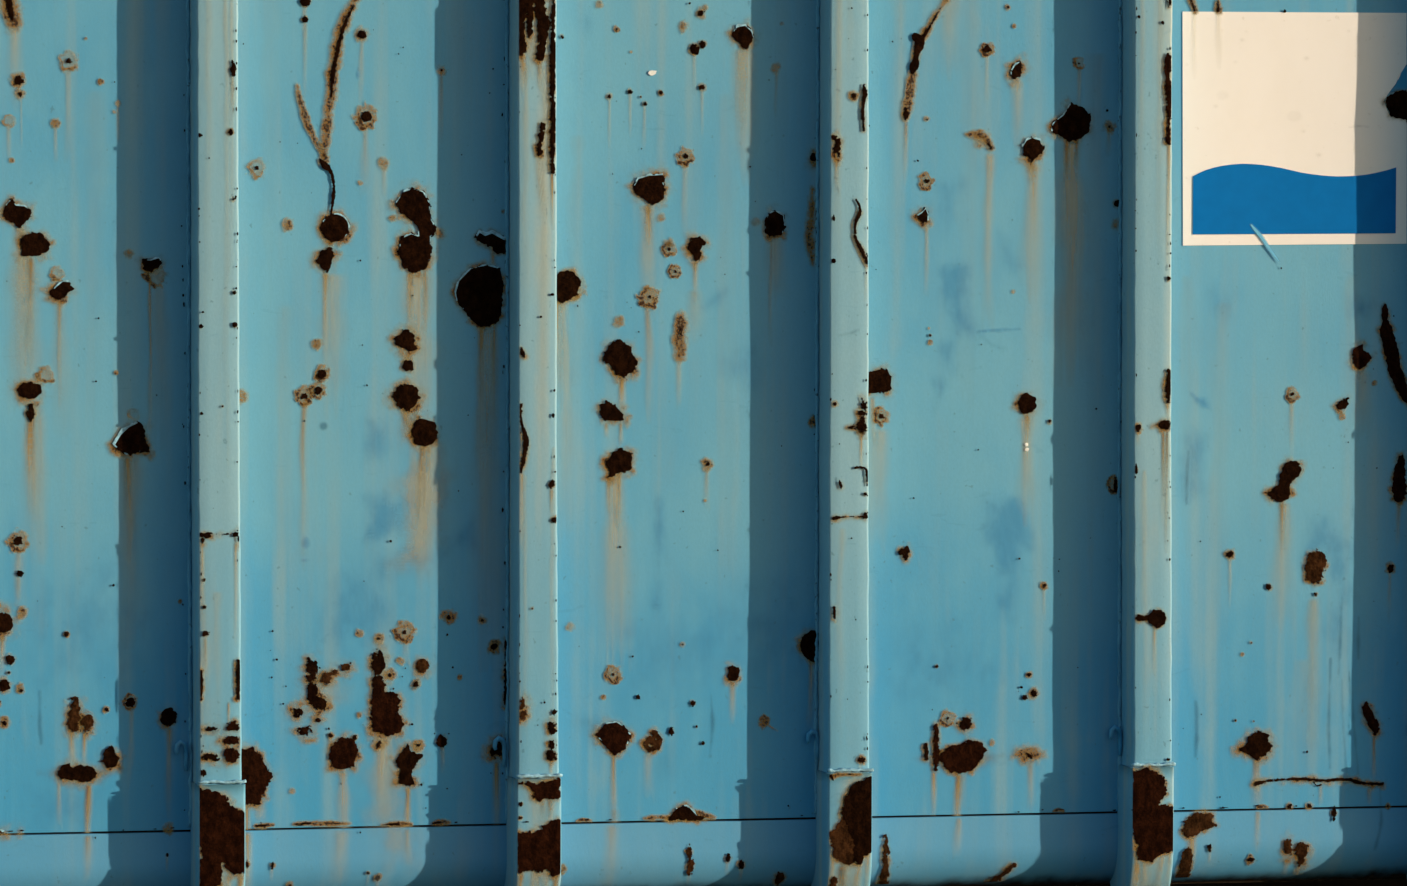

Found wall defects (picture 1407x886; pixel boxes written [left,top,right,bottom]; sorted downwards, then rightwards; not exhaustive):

rust [330,5,354,97]
rust [492,0,556,203]
rust [892,8,941,74]
rust [1022,102,1116,234]
rust [1383,90,1407,122]
rust [389,186,443,360]
rust [452,230,509,373]
rust [109,413,152,487]
rust [1263,458,1304,523]
rust [159,659,275,868]
rust [270,621,457,827]
rust [922,709,995,822]